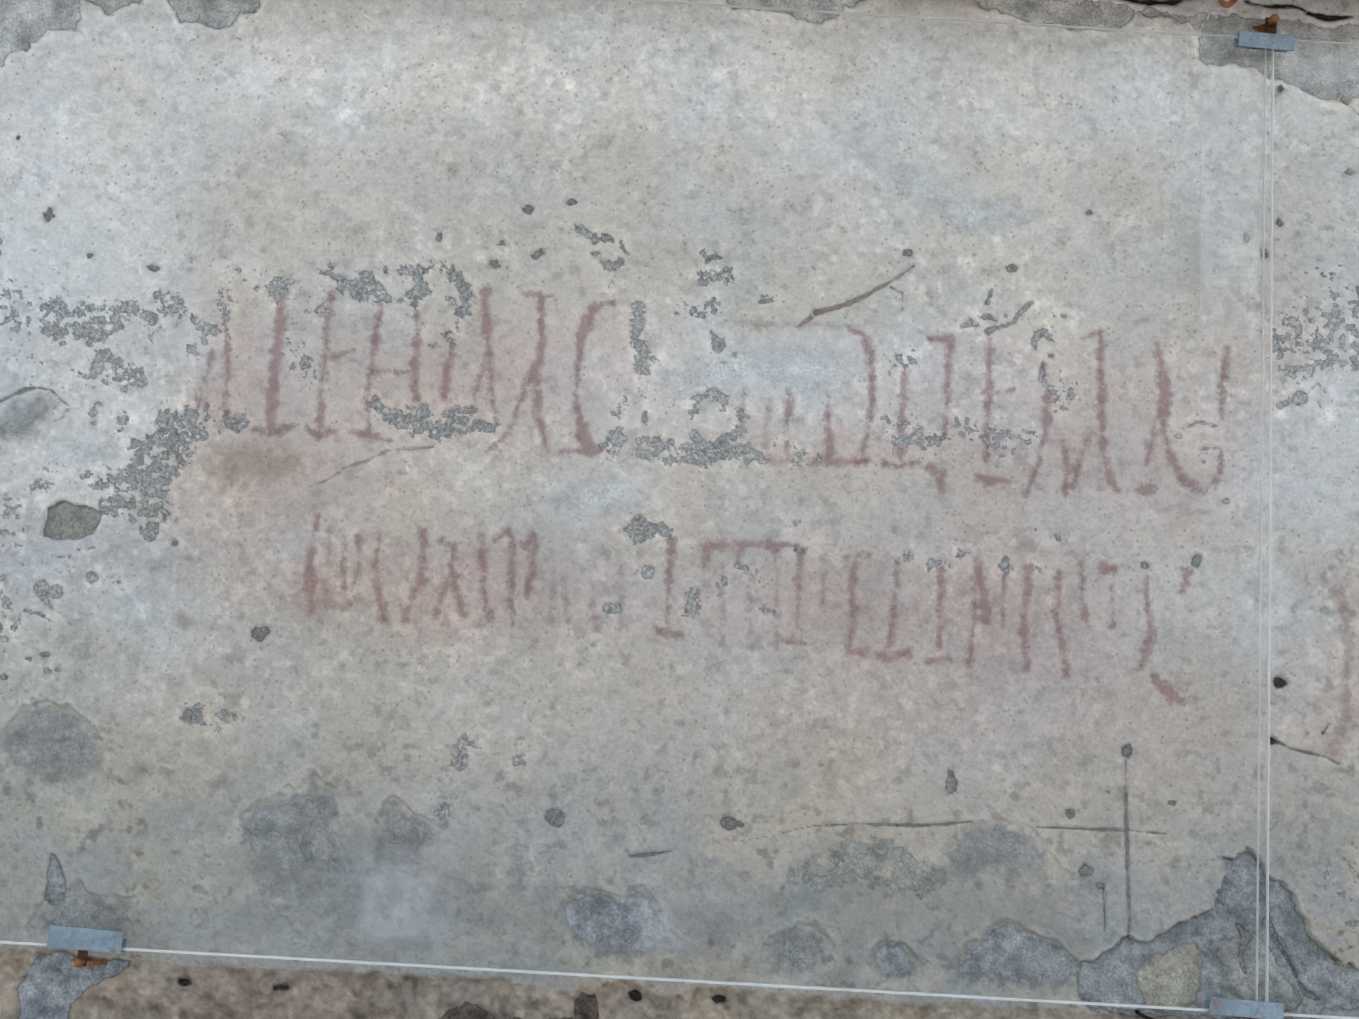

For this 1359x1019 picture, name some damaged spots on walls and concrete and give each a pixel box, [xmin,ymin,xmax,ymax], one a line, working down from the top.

flaking render [0,0,142,67]
flaking render [167,0,260,29]
flaking render [726,0,863,23]
flaking render [975,0,1359,105]
spalling [0,267,295,392]
spalling [1260,265,1359,409]
spalling [80,403,250,542]
spalling [1121,744,1132,757]
spalling [957,852,1359,1019]